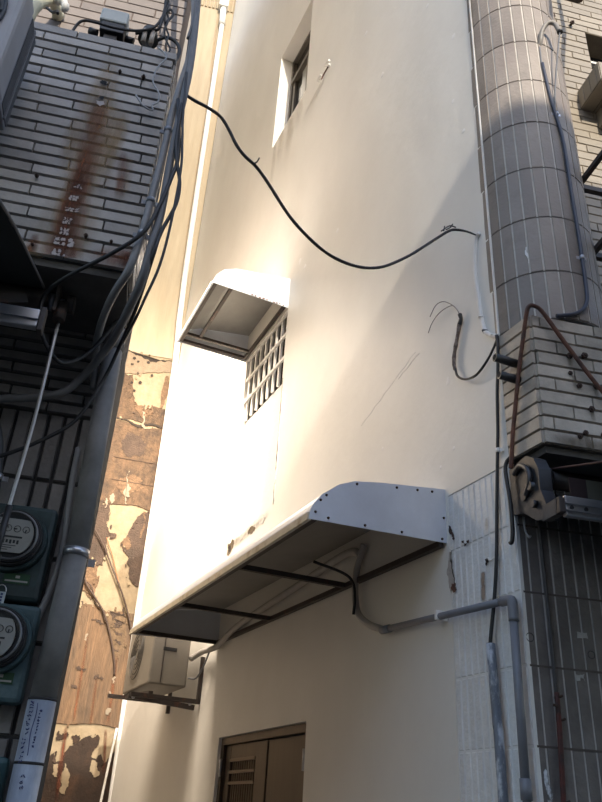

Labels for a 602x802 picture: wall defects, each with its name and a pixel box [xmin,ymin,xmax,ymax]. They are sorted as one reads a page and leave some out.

corrosion [51,105,110,255]
peeling [56,350,179,733]